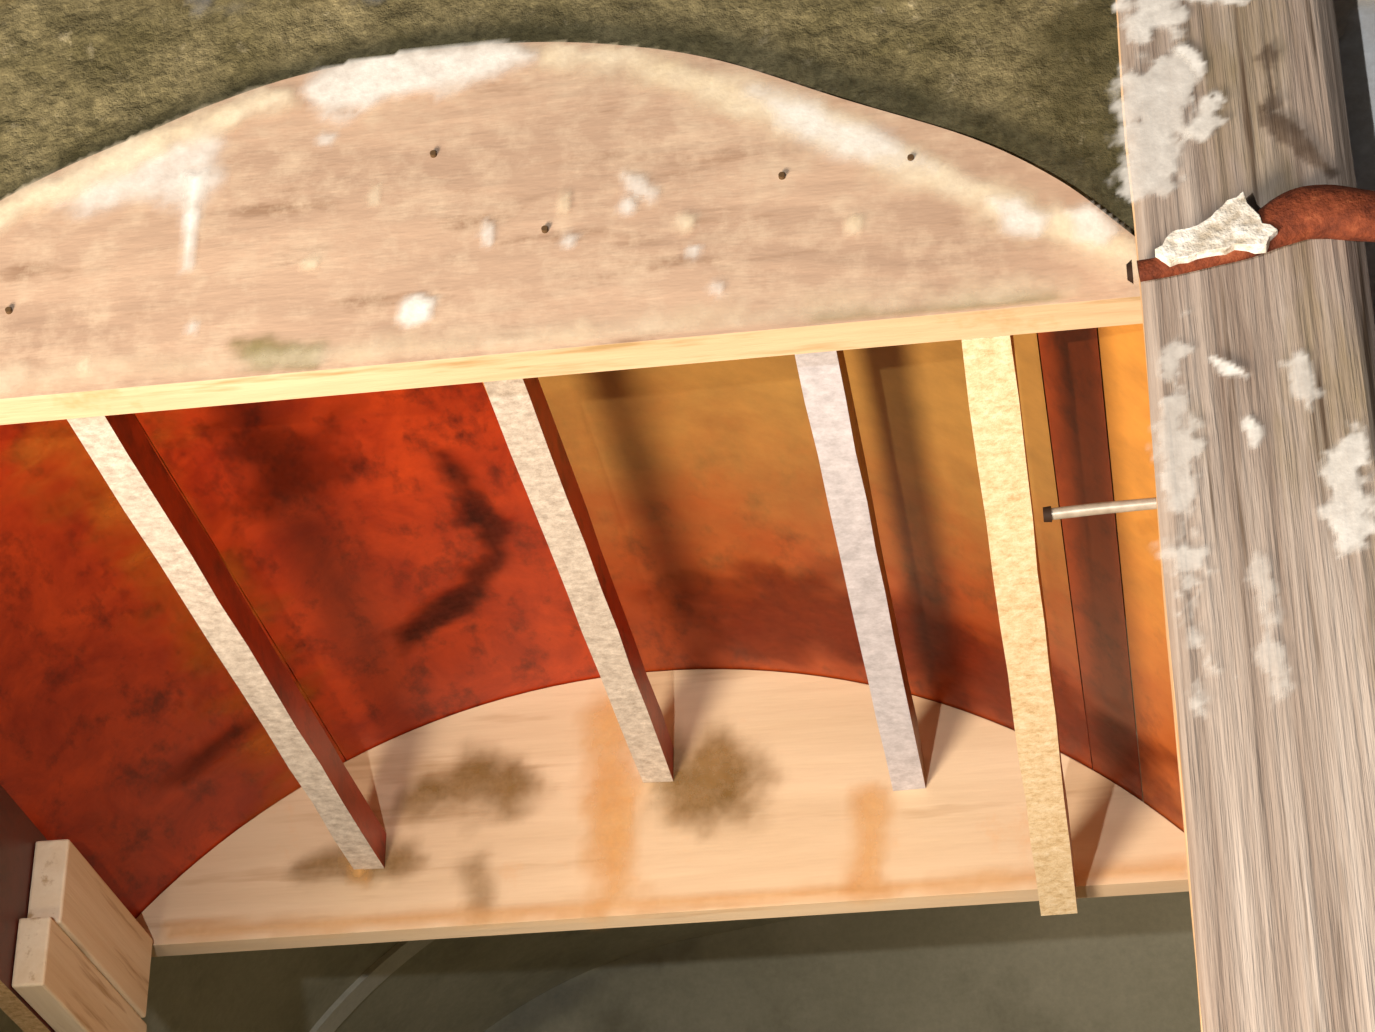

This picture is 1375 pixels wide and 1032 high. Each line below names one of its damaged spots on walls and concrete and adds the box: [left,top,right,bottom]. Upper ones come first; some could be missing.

water stain [596,705,632,888]